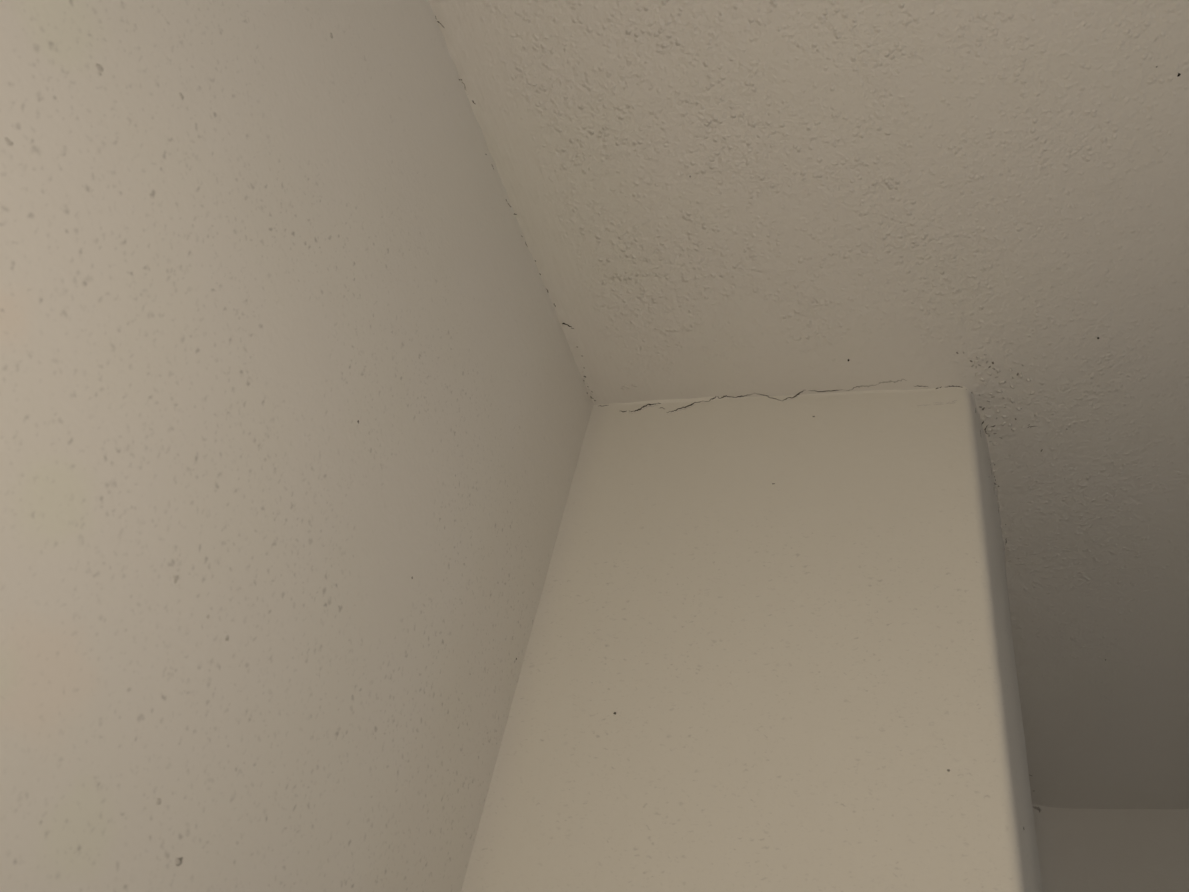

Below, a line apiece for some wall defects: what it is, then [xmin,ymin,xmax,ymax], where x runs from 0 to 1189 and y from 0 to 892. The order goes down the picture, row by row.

crack [600,379,972,414]